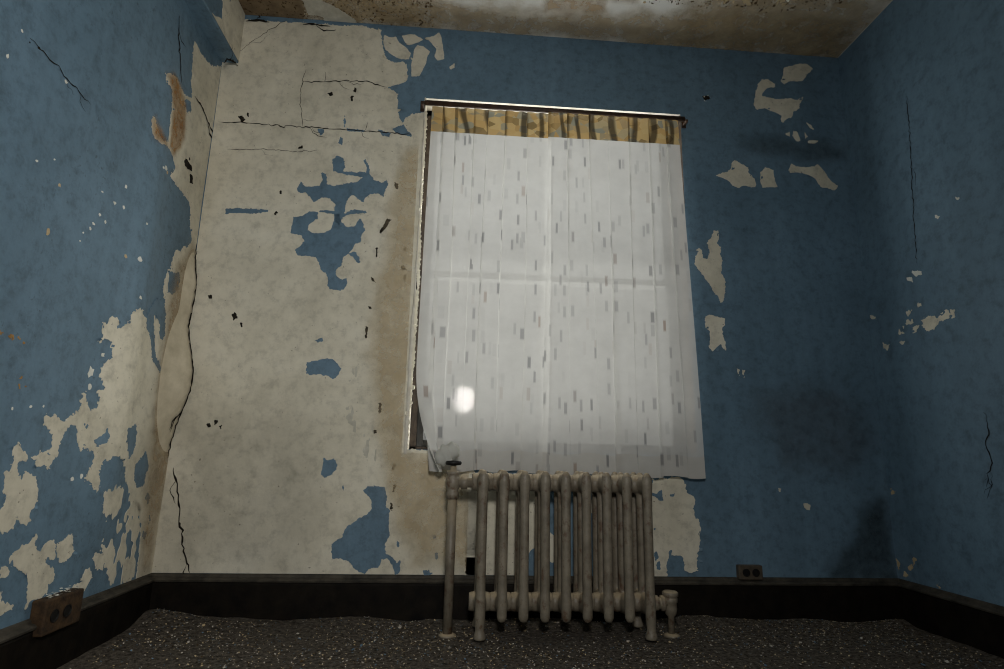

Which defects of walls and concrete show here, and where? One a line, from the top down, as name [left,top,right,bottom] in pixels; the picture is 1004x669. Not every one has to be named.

crack [30,38,87,109]
peeling [754,64,818,144]
peeling [716,160,778,188]
peeling [0,0,496,591]
peeling [694,230,726,303]
peeling [705,315,726,351]
peeling [883,303,955,351]
crack [168,244,197,574]
crack [985,420,993,498]
peeling [507,491,516,575]
peeling [652,477,703,576]
peeling [0,534,77,616]